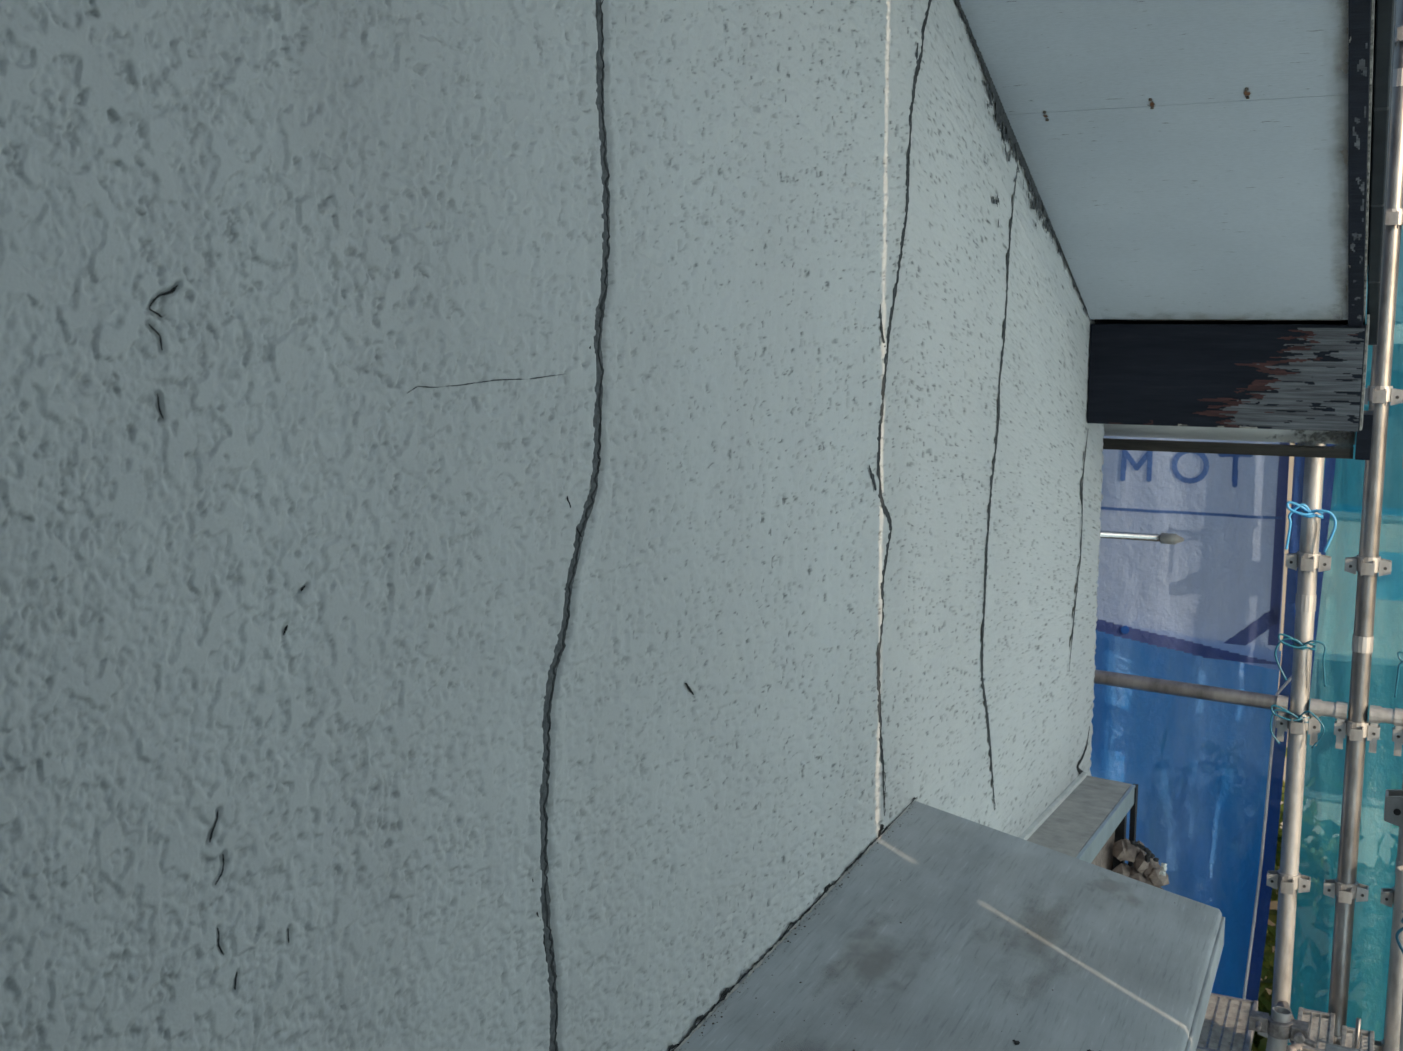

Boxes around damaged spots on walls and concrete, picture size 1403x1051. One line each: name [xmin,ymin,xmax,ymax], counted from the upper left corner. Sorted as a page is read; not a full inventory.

crack [408,374,563,393]
crack [532,0,610,1051]
crack [668,0,1091,1051]
peeling [1178,177,1365,431]